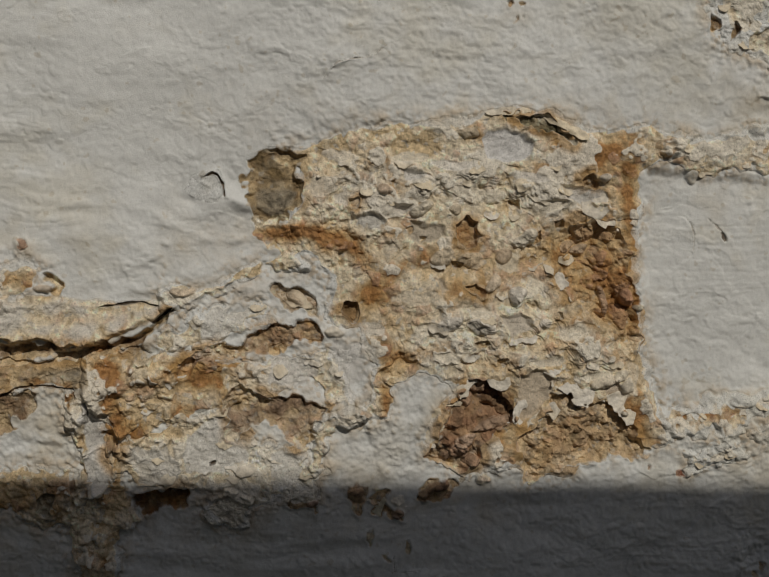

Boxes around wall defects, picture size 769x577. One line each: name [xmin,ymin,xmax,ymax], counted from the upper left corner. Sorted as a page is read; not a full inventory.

flaking render [702,0,769,73]
flaking render [0,105,676,531]
crack [0,384,75,399]